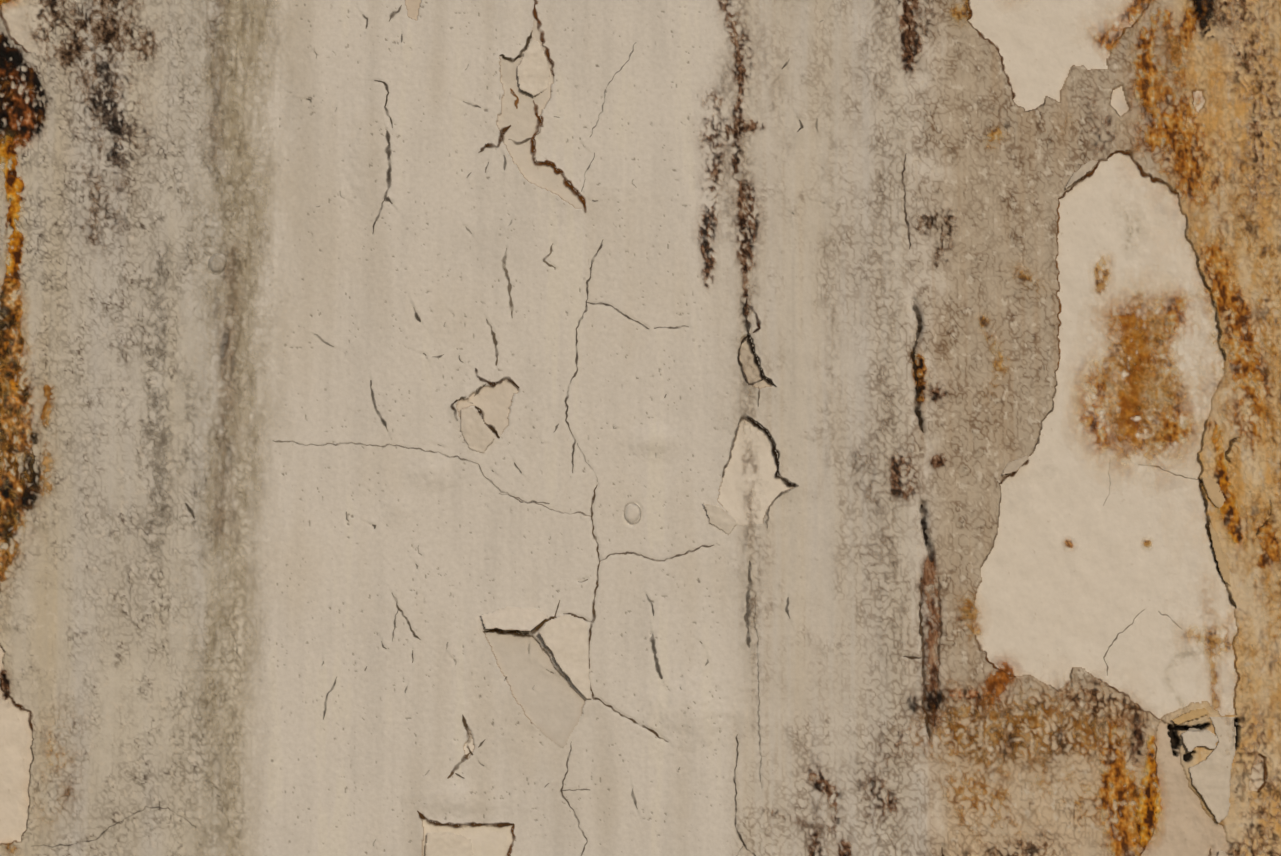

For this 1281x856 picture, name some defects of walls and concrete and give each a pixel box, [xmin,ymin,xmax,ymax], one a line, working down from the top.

corrosion [0,33,53,582]
damp [32,0,157,244]
damp [146,382,170,526]
crack [373,80,393,233]
crack [273,240,713,742]
peeling [480,607,592,748]
corrosion [699,0,764,315]
crack [744,561,752,647]
corrosion [887,557,1162,856]
peeling [966,0,1148,111]
peeling [973,150,1240,856]
corrosion [1081,0,1281,569]